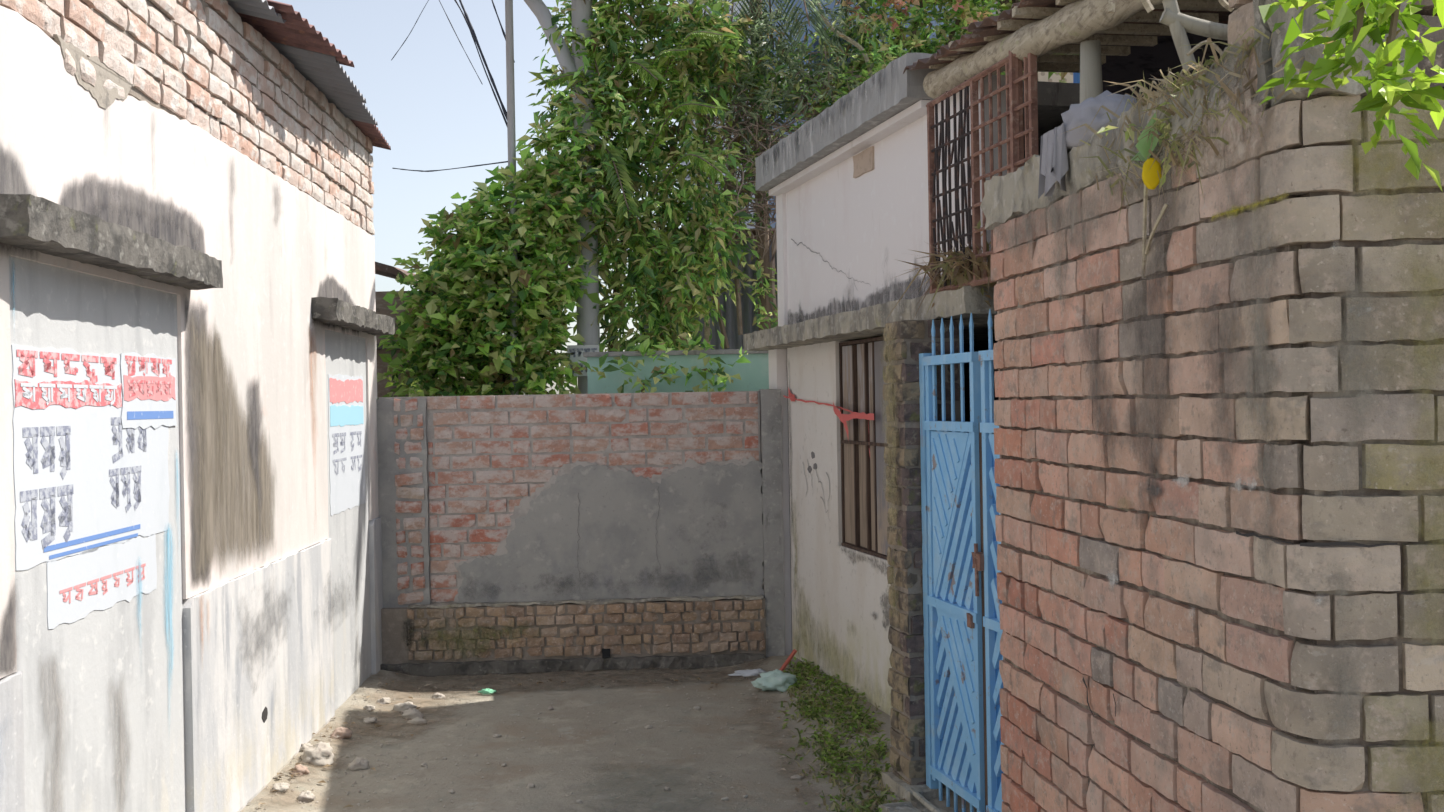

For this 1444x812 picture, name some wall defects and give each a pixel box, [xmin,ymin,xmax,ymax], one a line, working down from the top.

flaking render [53,34,136,109]
leakage [0,147,28,194]
leakage [61,178,205,253]
leakage [319,277,354,305]
leakage [177,305,275,582]
flaking render [394,391,759,605]